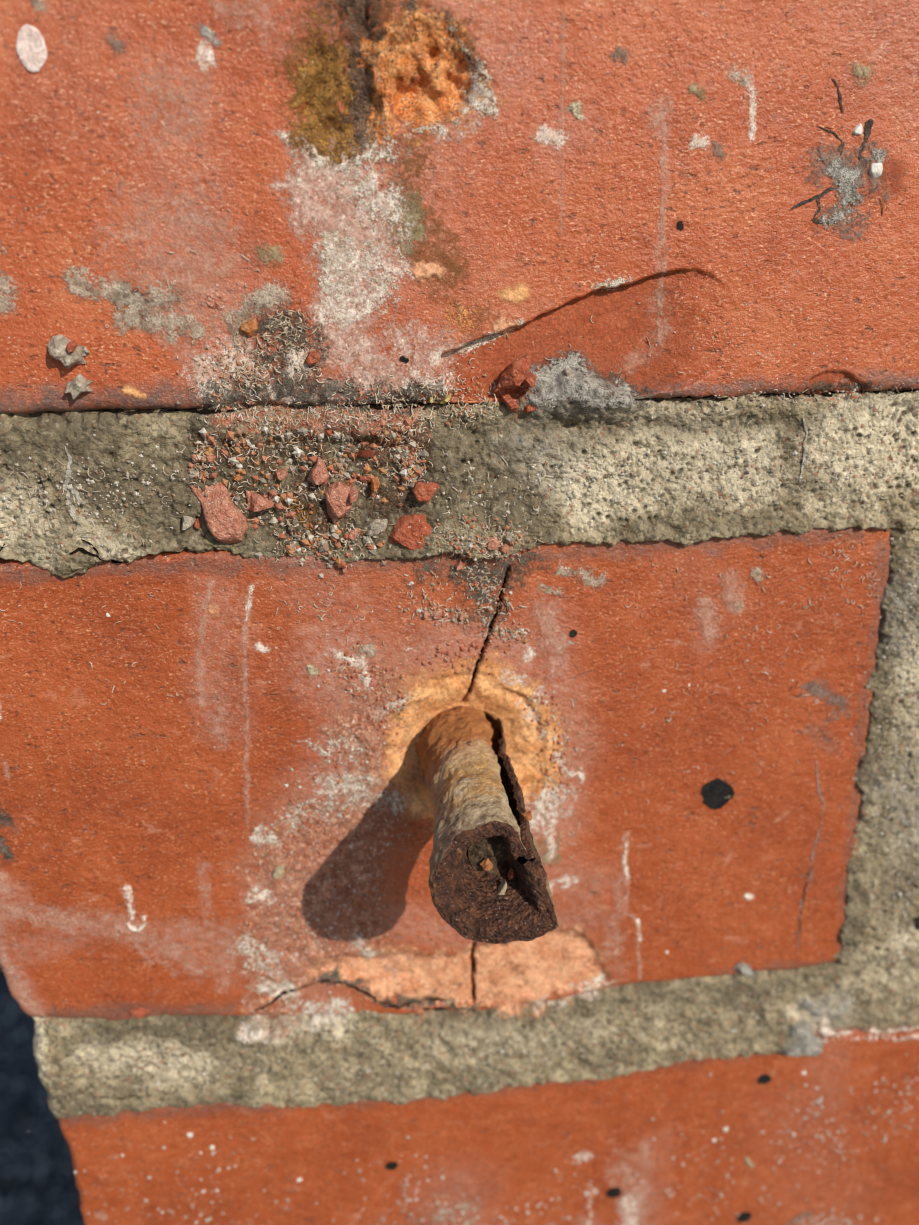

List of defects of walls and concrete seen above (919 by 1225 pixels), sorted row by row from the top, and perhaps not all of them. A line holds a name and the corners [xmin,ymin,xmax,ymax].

rust [283,0,500,339]
leakage [94,127,480,450]
spalling [441,274,695,412]
spalling [191,473,275,544]
spalling [274,468,288,481]
leakage [286,495,324,550]
spalling [307,457,380,523]
spalling [387,481,439,550]
crack [463,567,508,698]
spalling [227,645,613,1044]
rust [480,857,493,870]
crack [255,941,476,1012]